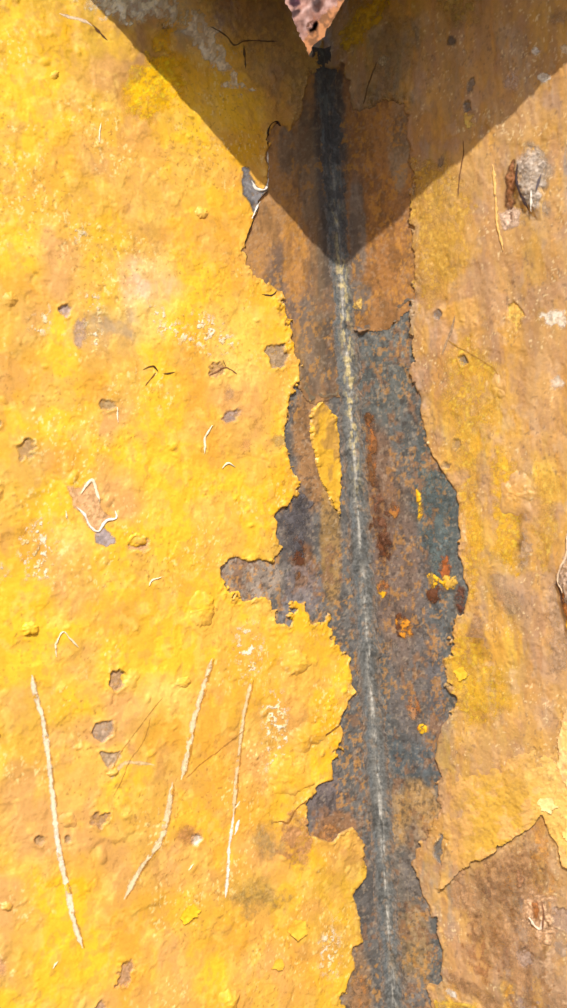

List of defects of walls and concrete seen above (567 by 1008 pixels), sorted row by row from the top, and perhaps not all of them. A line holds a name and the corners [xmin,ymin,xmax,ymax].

corrosion [277,813,312,864]
peeling [220,71,384,1008]
peeling [334,64,567,1008]
corrosion [450,821,567,1008]